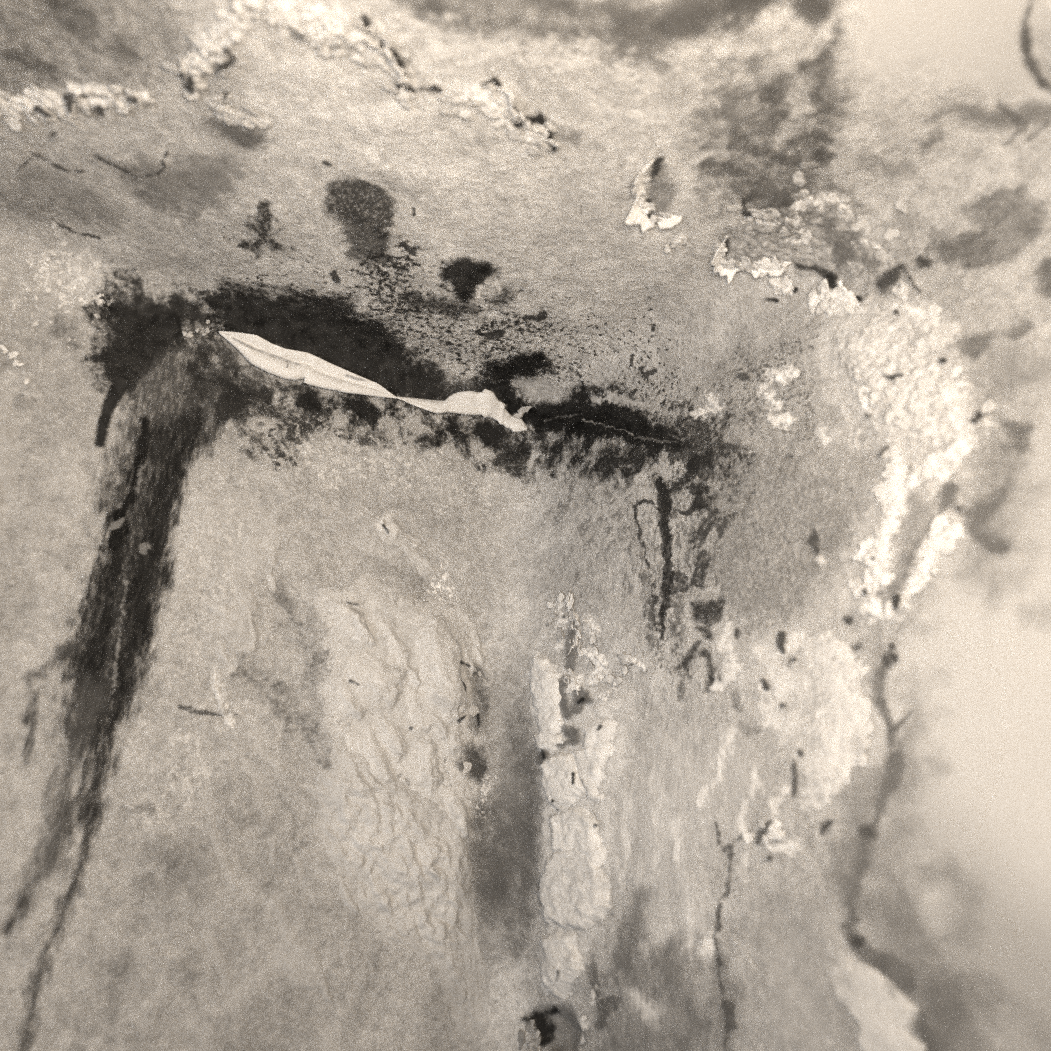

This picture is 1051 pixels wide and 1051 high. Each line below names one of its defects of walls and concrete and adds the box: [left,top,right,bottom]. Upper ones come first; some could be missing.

peeling [0,73,155,136]
peeling [161,0,718,157]
leakage [665,0,769,33]
leakage [699,28,845,209]
peeling [711,163,936,318]
leakage [3,179,1043,956]
peeling [518,591,649,1051]
peeling [710,620,875,861]
leakage [841,643,916,992]
crack [713,822,742,1051]
peeling [823,924,926,1051]
leakage [917,1021,940,1051]